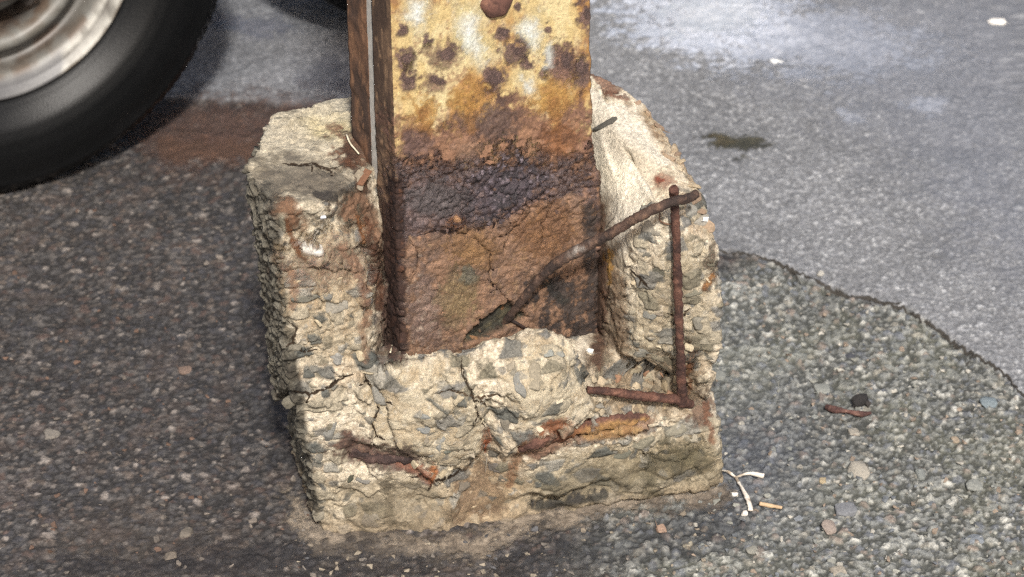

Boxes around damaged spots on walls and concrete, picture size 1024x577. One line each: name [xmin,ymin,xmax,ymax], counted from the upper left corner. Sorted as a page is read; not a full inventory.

corrosion [575,0,591,31]
corrosion [270,24,629,370]
crack [410,195,560,300]
crack [286,320,317,353]
spalling [500,244,710,433]
crack [294,363,393,444]
crack [437,357,510,426]
corrosion [332,430,438,483]
crack [406,467,466,491]
corrosion [522,417,654,460]